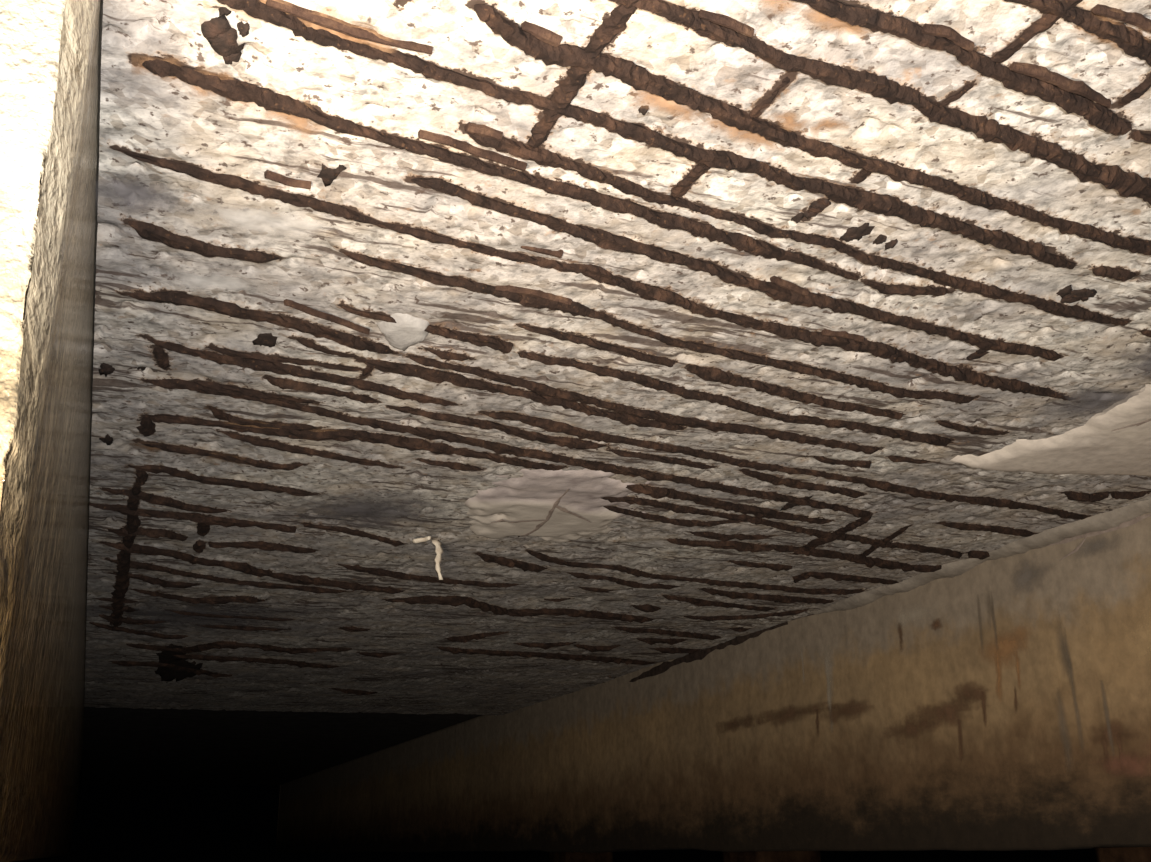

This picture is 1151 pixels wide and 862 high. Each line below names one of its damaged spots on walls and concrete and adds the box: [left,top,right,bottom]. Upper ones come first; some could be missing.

corrosion [809,11,867,33]
corrosion [306,23,388,50]
corrosion [641,92,692,117]
corrosion [272,111,320,131]
corrosion [712,121,773,145]
corrosion [777,115,841,130]
spalling [84,0,1151,716]